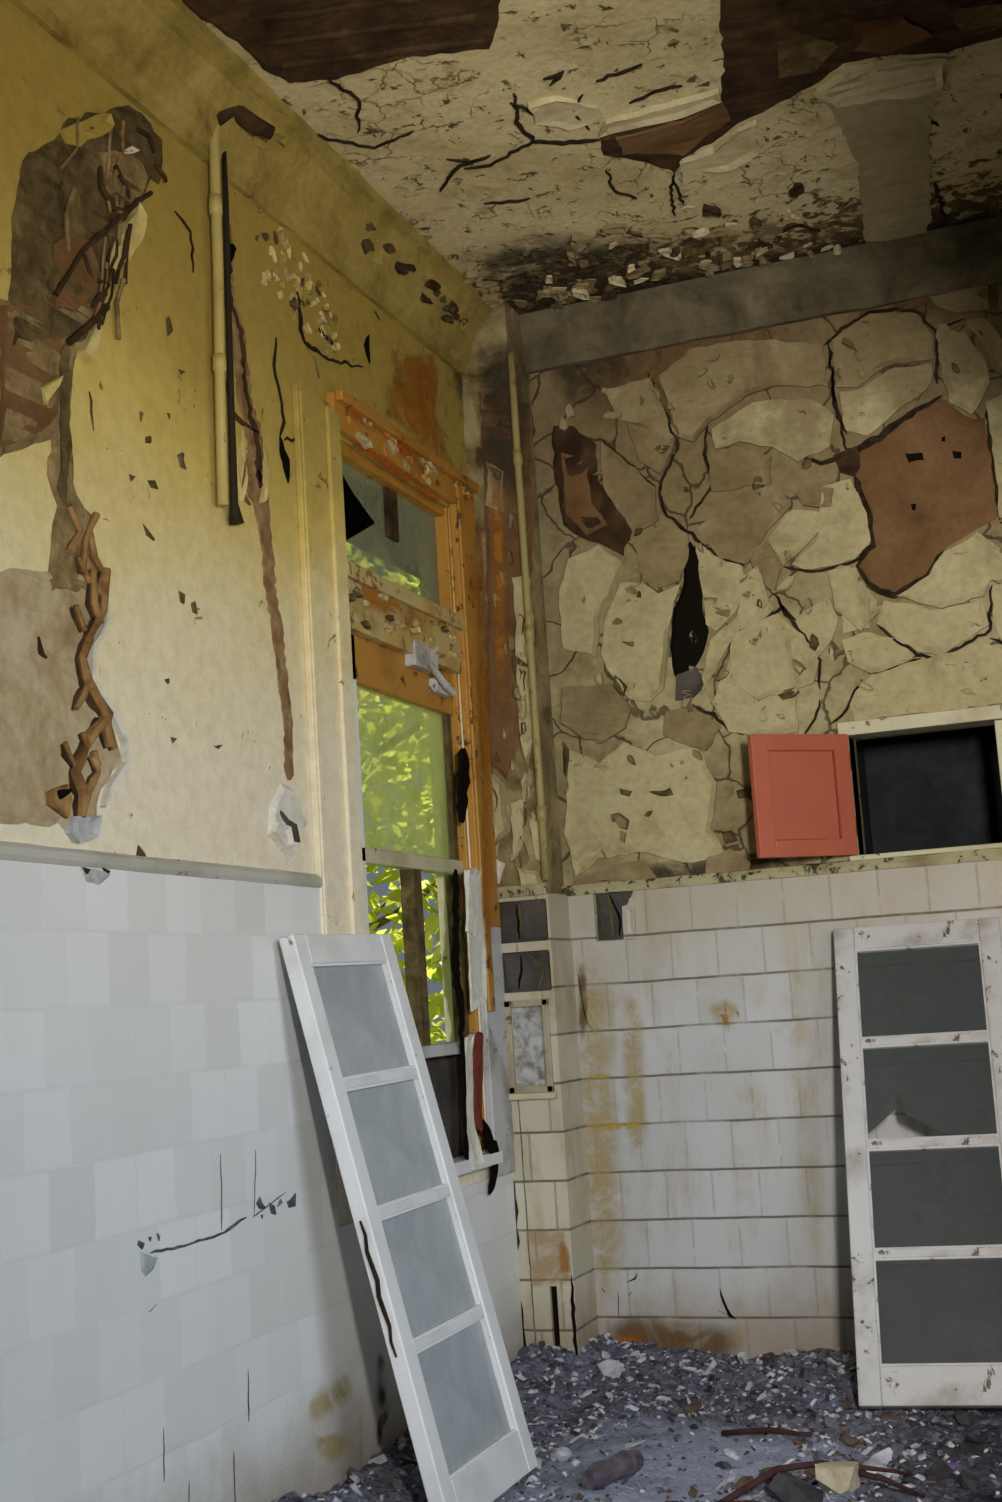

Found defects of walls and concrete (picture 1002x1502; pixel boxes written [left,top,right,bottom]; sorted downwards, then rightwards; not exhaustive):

flaking render [182,0,501,83]
crack [317,79,414,149]
crack [439,63,684,217]
flaking render [528,0,1002,186]
peeling [462,182,842,316]
flaking render [0,105,168,844]
crack [599,372,746,567]
crack [804,307,964,466]
peeling [551,283,1002,941]
crack [739,542,1002,734]
flaking render [454,392,552,1195]
crack [137,1150,296,1313]